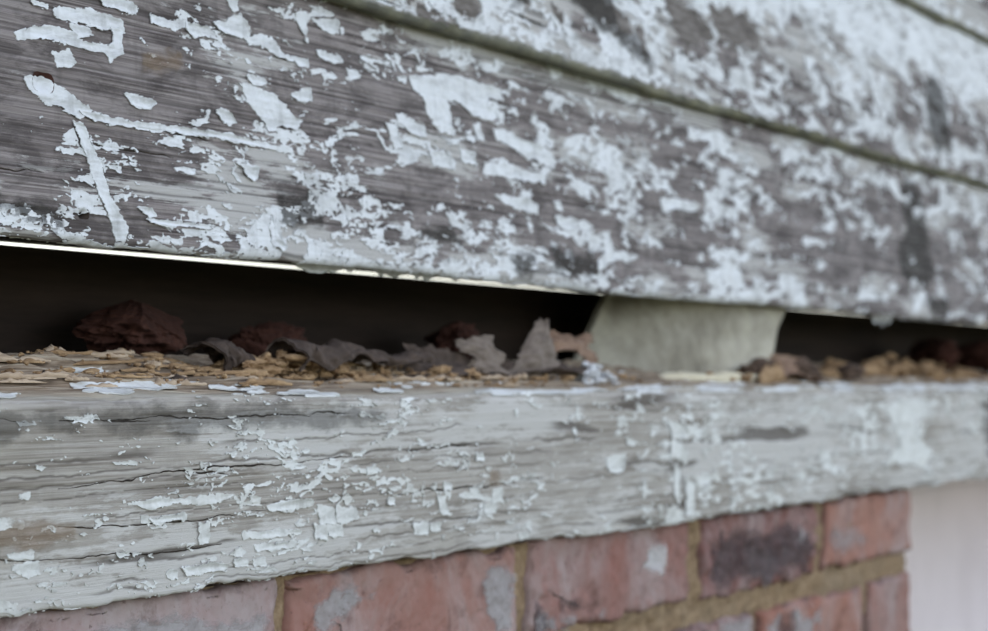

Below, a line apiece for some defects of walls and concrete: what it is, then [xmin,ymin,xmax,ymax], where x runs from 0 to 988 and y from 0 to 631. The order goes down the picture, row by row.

peeling [14,0,343,68]
peeling [405,0,480,28]
peeling [663,0,761,52]
peeling [385,64,556,186]
peeling [24,73,313,243]
peeling [495,193,538,215]
peeling [660,197,700,213]
peeling [880,398,933,469]
peeling [667,420,697,516]
peeling [122,492,234,545]
peeling [266,498,360,542]
peeling [413,481,453,536]